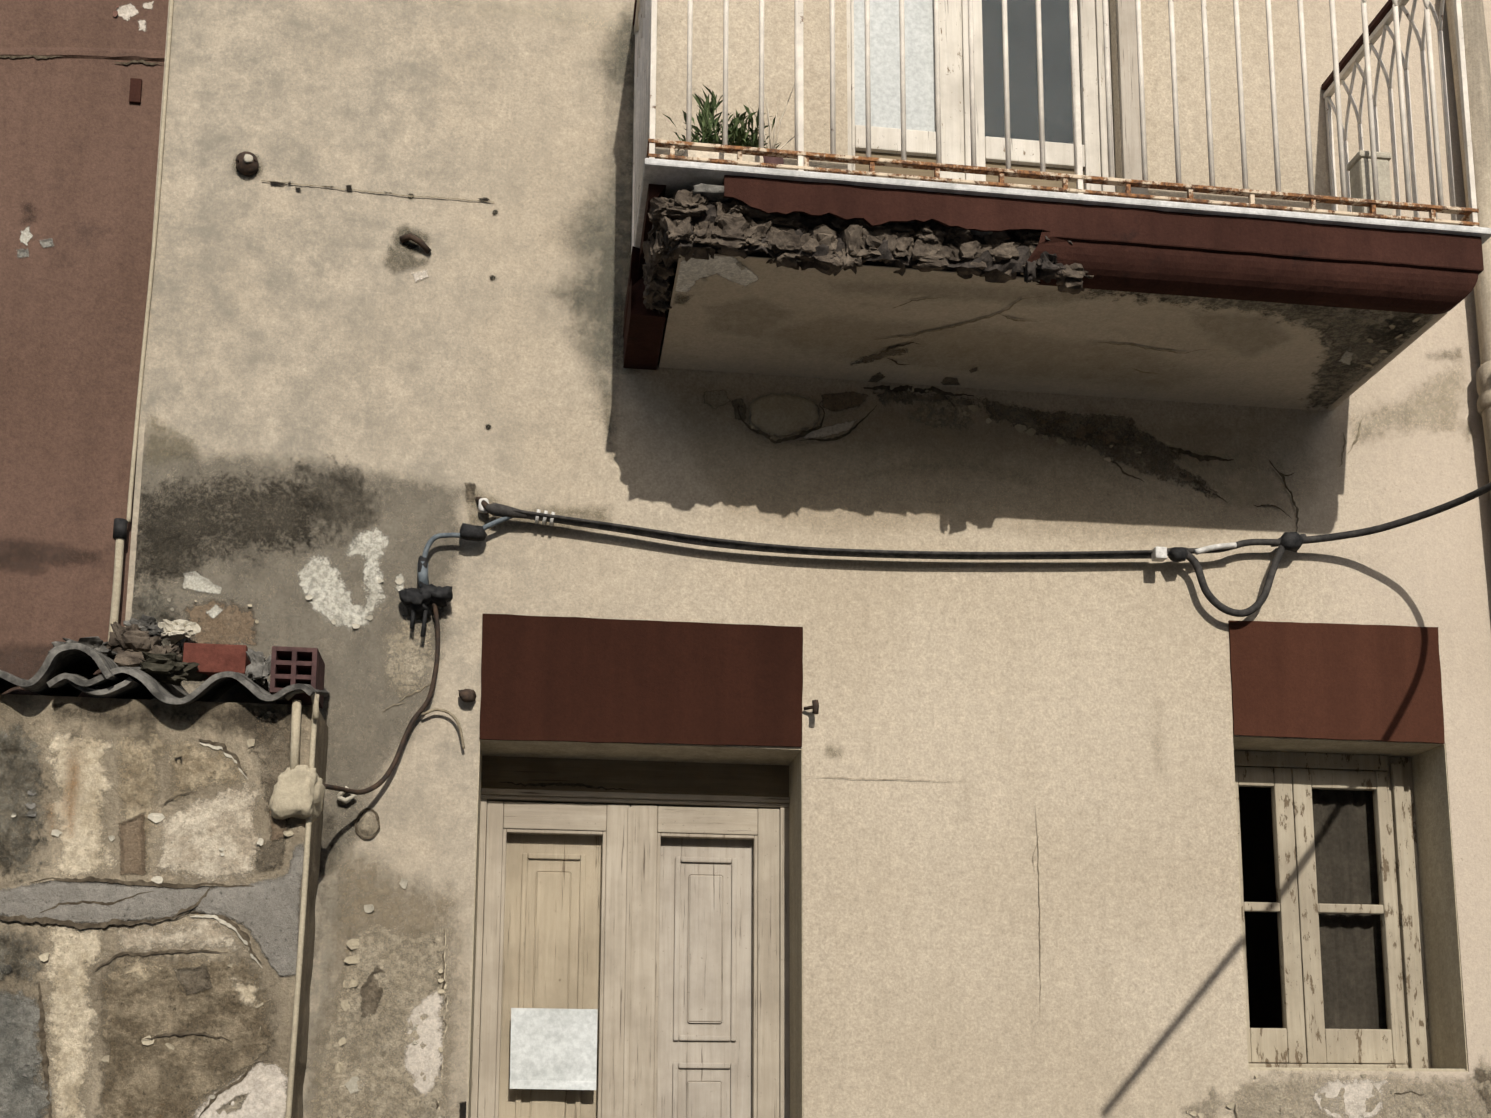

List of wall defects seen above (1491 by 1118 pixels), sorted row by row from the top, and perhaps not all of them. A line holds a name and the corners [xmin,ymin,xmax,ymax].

damp [574,23,635,386]
spalling [642,183,1094,321]
crack [864,385,974,410]
damp [1086,289,1433,409]
peeling [297,527,405,629]
peeling [11,710,294,884]
damp [131,424,476,1118]
crack [0,876,262,968]
spalling [39,919,288,1118]
peeling [308,904,466,1118]
peeling [1187,1061,1491,1118]